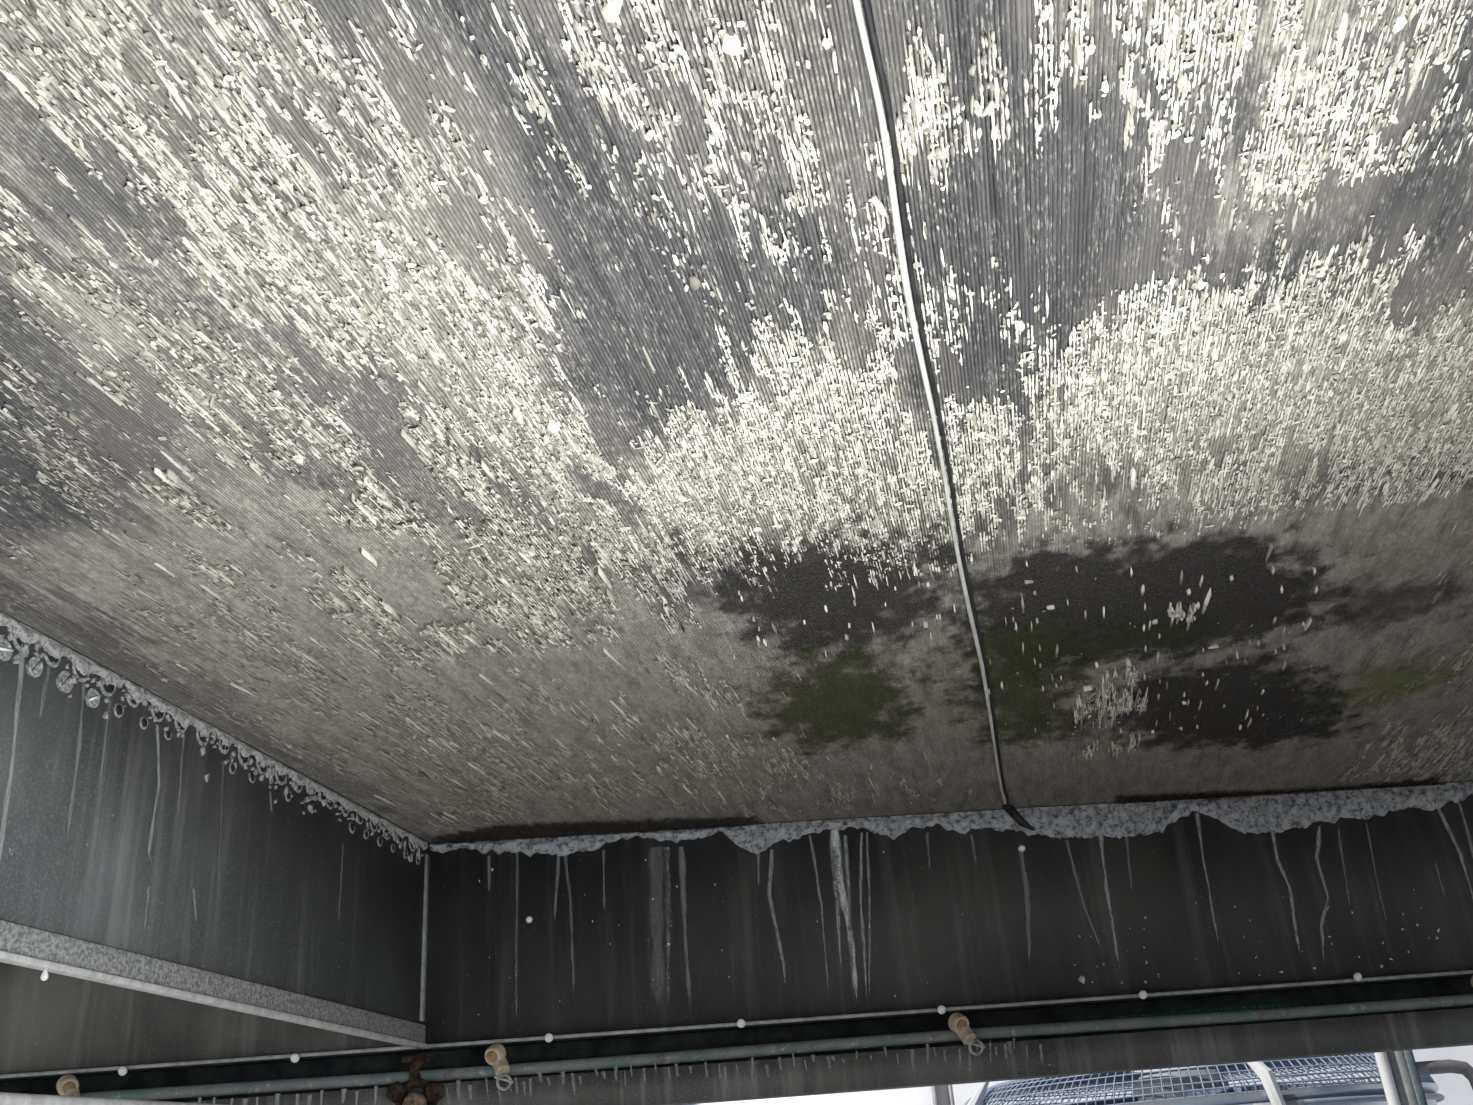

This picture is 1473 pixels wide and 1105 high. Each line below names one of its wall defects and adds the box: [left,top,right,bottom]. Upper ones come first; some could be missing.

peeling [0,0,1473,862]
damp [0,611,1473,998]
damp [671,516,1460,752]